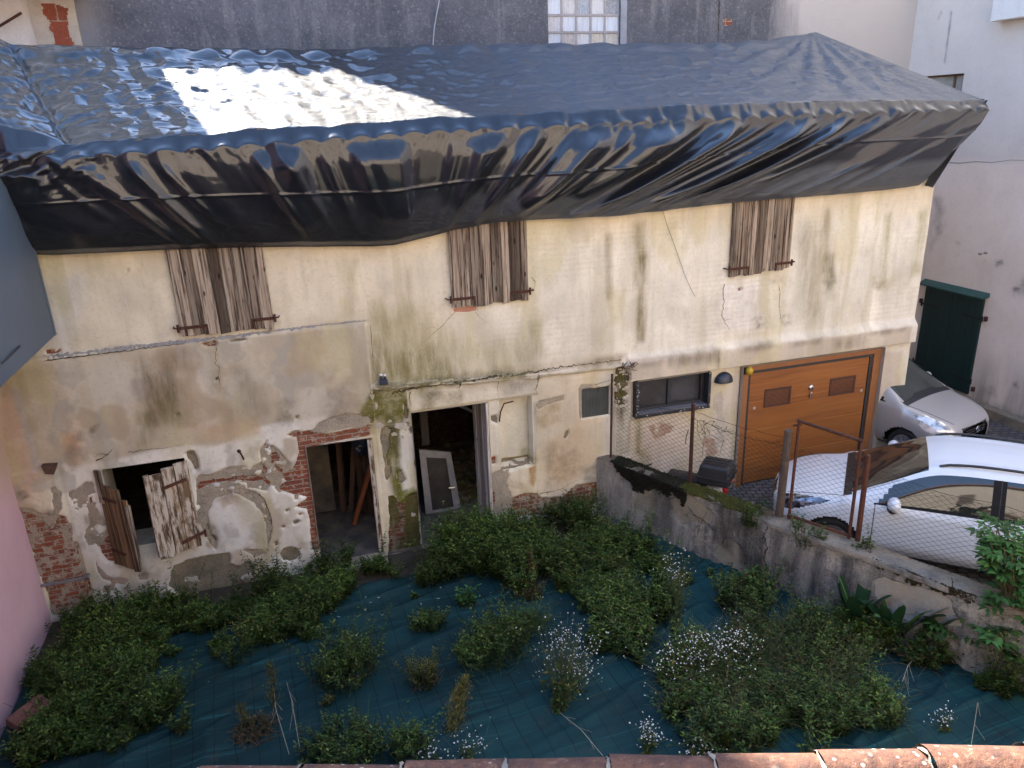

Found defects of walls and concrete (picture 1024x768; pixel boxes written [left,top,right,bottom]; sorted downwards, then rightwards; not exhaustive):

flaking render [20,482,149,615]
flaking render [169,394,412,594]